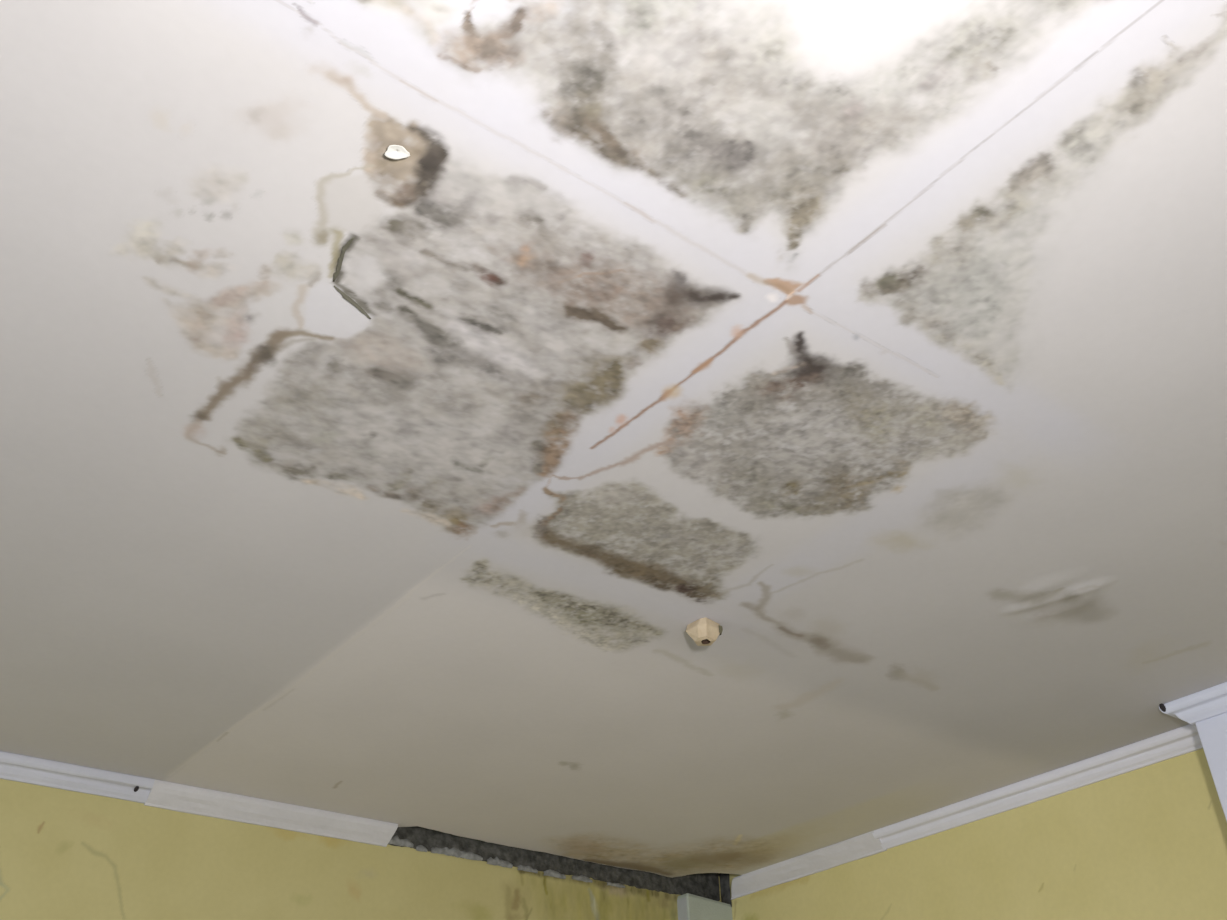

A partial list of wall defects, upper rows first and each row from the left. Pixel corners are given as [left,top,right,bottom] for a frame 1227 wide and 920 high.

damp [105,0,1227,607]
crack [799,0,1165,380]
damp [417,555,773,684]
flaking render [387,826,732,907]